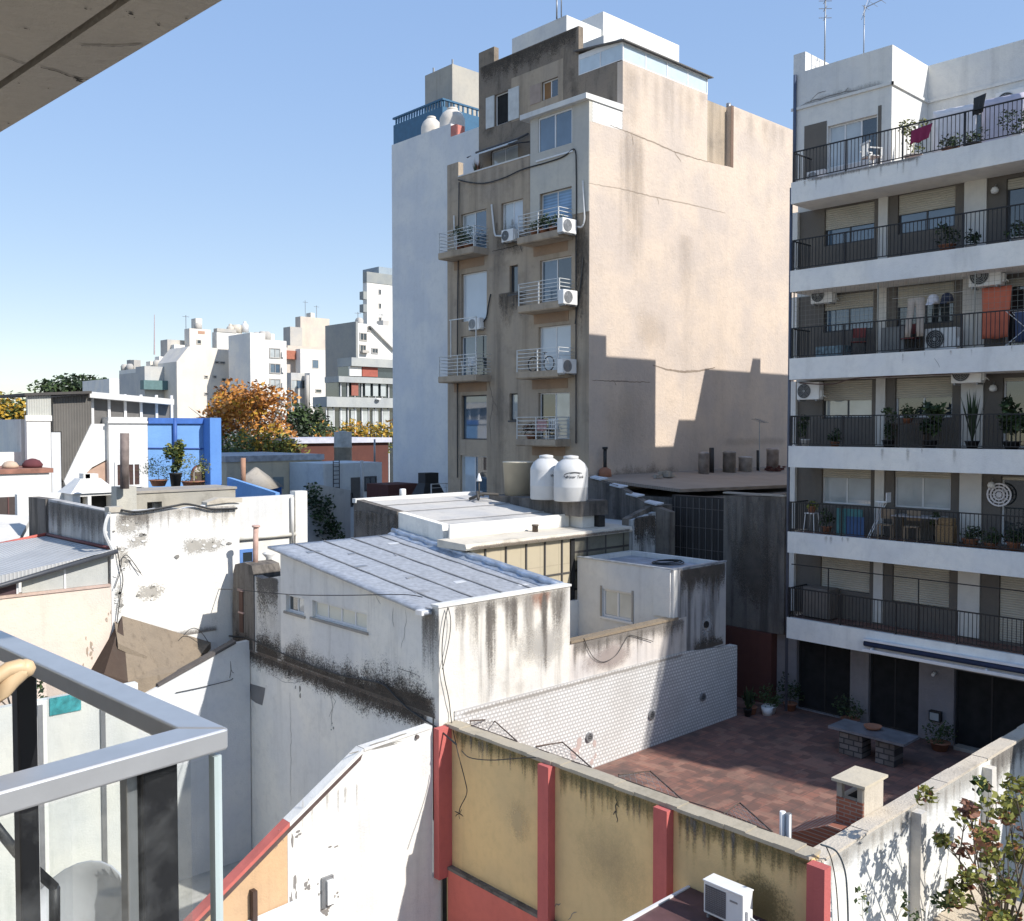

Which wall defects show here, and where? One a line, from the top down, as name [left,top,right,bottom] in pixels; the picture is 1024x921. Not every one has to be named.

crack [611,125,713,163]
crack [591,183,724,213]
peeling [105,518,165,622]
peeling [174,537,232,559]
leakage [235,575,435,726]
leakage [486,600,517,656]
leakage [526,593,564,658]
leakage [694,616,723,650]